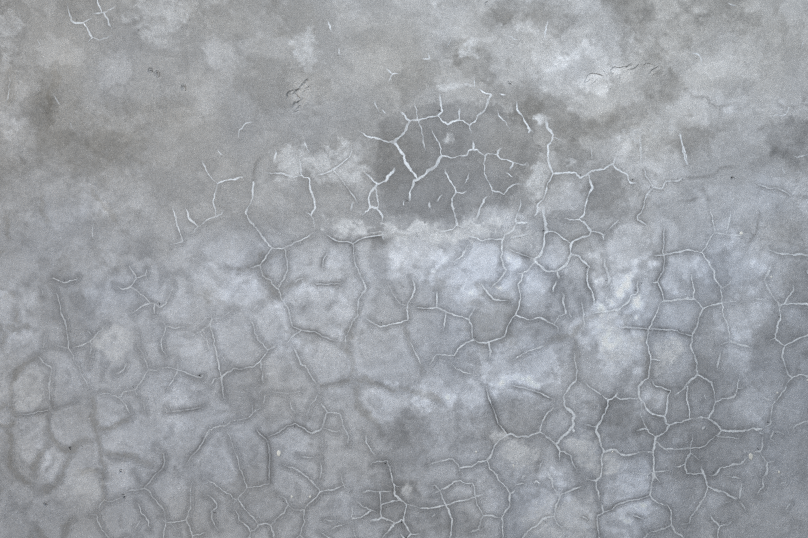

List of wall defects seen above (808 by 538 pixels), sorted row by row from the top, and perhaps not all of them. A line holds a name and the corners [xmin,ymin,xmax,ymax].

crack [64,0,119,46]
crack [686,87,738,117]
crack [676,132,692,167]
crack [16,78,643,538]
crack [318,164,808,538]